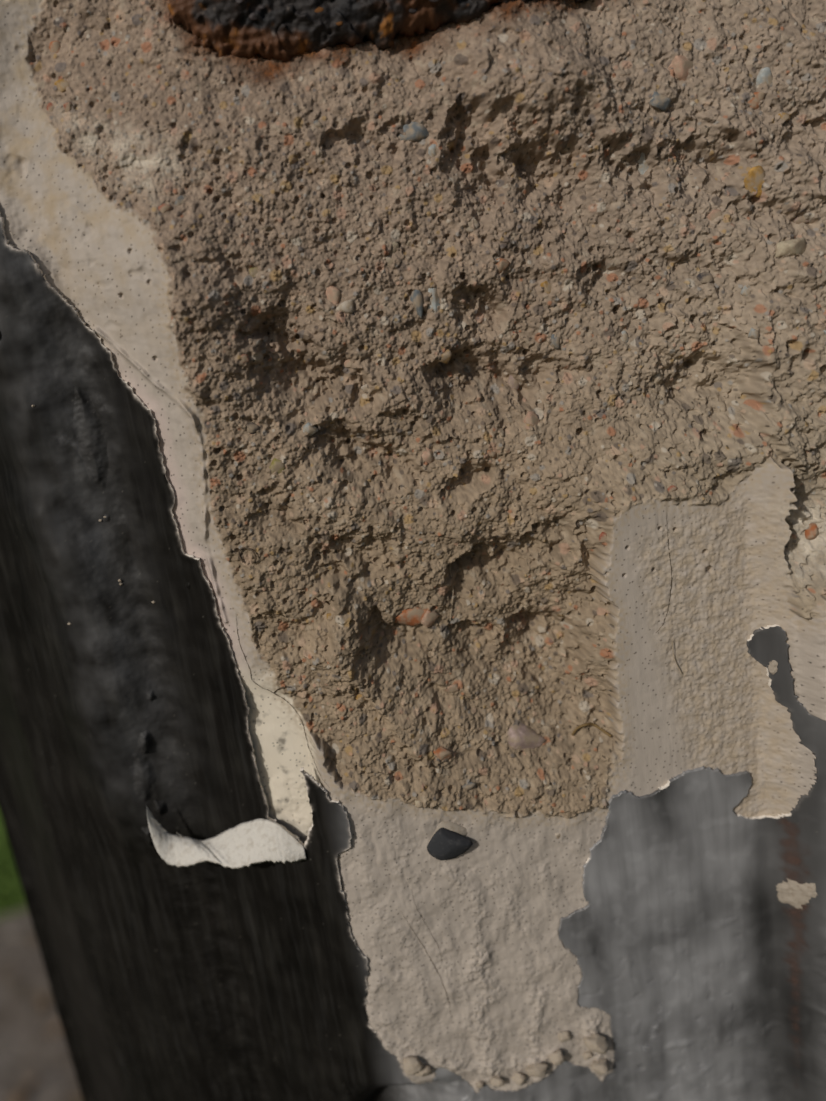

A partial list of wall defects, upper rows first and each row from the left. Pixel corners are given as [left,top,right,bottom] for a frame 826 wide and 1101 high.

rust [233,51,318,80]
spalling [0,0,826,844]
peeling [319,744,621,1093]
peeling [775,879,817,909]